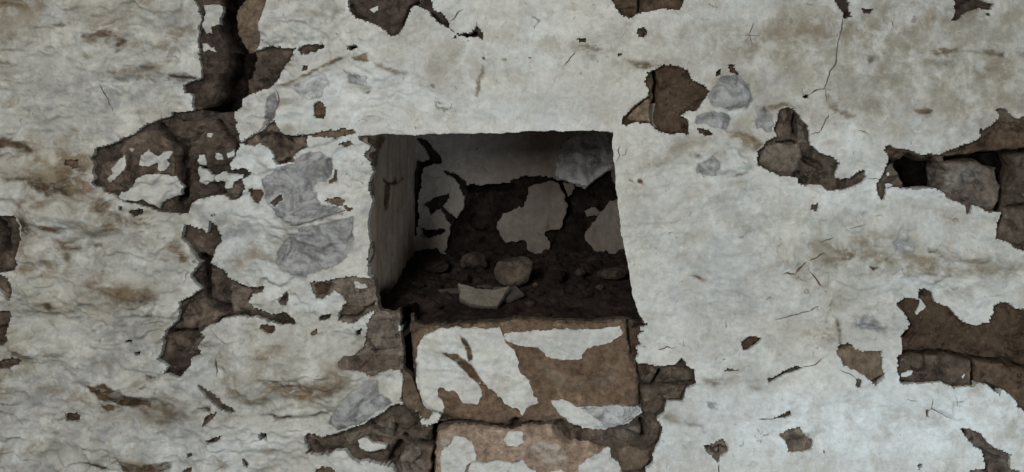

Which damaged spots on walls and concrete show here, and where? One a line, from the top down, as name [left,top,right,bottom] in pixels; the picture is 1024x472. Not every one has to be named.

crack [808,18,843,135]
flaking render [0,215,22,298]
flaking render [93,0,696,472]
flaking render [414,65,865,254]
flaking render [876,109,1024,252]
flaking render [0,311,12,345]
flaking render [836,342,884,387]
flaking render [897,288,1024,411]
flaking render [961,428,1018,472]